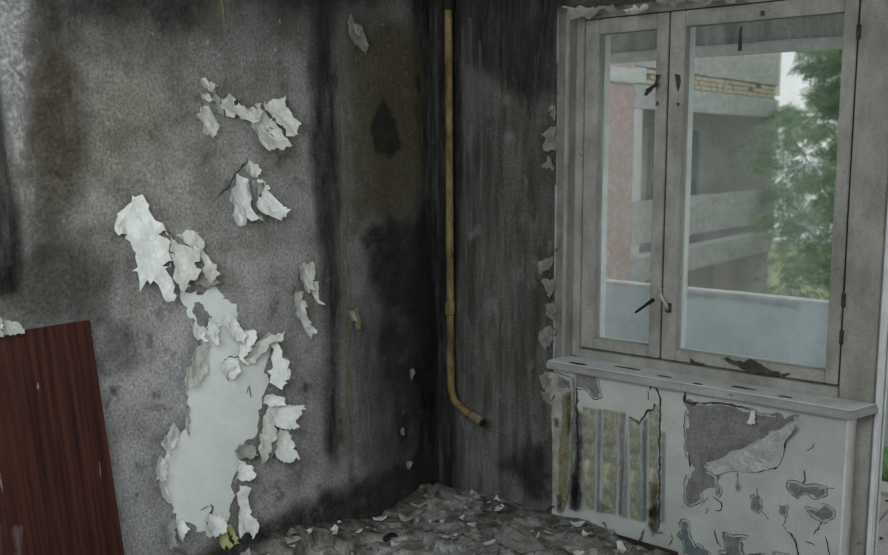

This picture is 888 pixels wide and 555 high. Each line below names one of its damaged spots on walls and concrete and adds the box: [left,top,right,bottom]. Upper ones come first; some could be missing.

water stain [40,0,202,32]
peeling [197,77,301,151]
water stain [0,0,106,317]
peeling [217,159,291,226]
peeling [0,317,25,337]
peeling [295,261,326,339]
water stain [207,0,562,555]
peeling [114,194,305,550]
flaking render [539,362,603,512]
peeling [683,392,799,508]
peeling [679,519,748,555]
peeling [779,470,836,534]